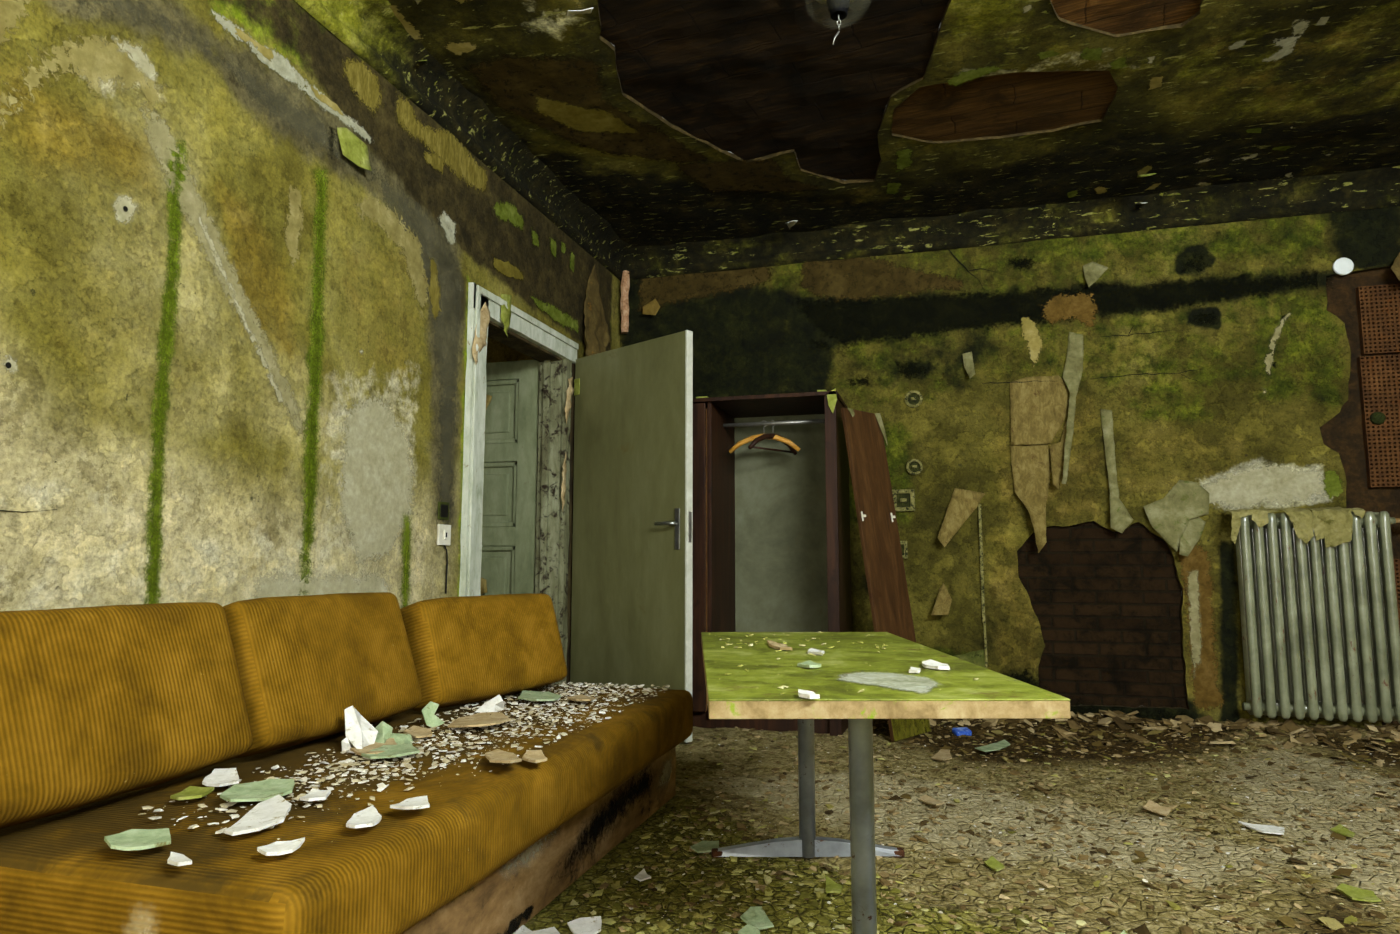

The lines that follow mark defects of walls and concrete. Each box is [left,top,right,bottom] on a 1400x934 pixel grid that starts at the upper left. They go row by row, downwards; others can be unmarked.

peeling [389,0,424,41]
peeling [444,42,477,56]
peeling [567,0,1203,204]
water stain [149,155,181,603]
water stain [204,42,465,521]
spalling [1021,292,1098,367]
flaking render [1320,266,1400,559]
flaking render [1017,521,1224,712]